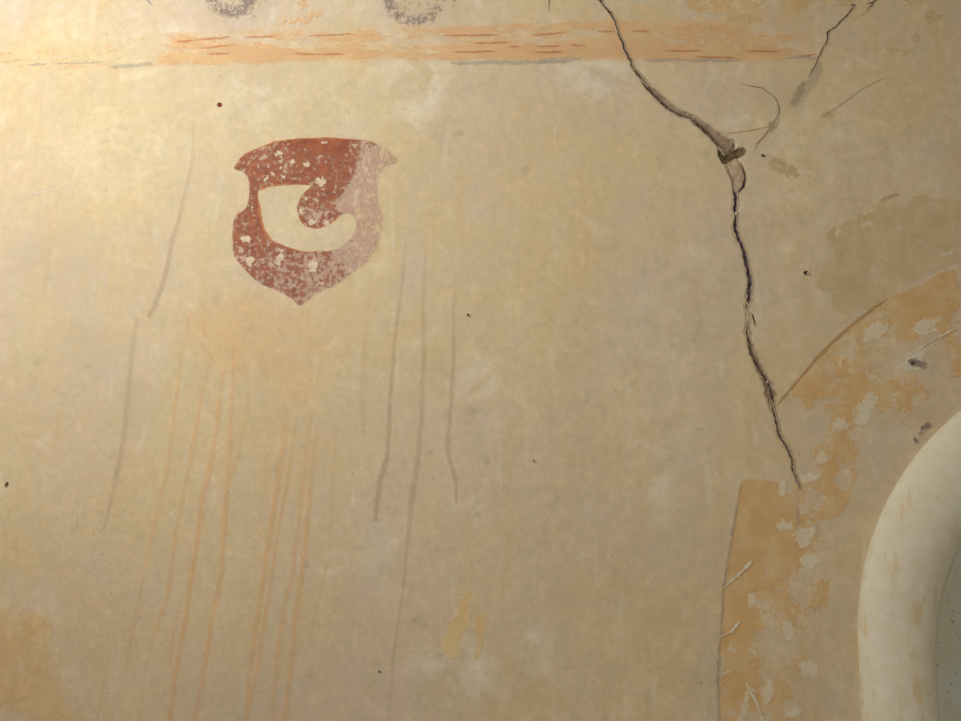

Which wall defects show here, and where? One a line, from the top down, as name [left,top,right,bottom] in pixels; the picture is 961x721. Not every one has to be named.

crack [598,0,878,536]
spalling [908,357,925,368]